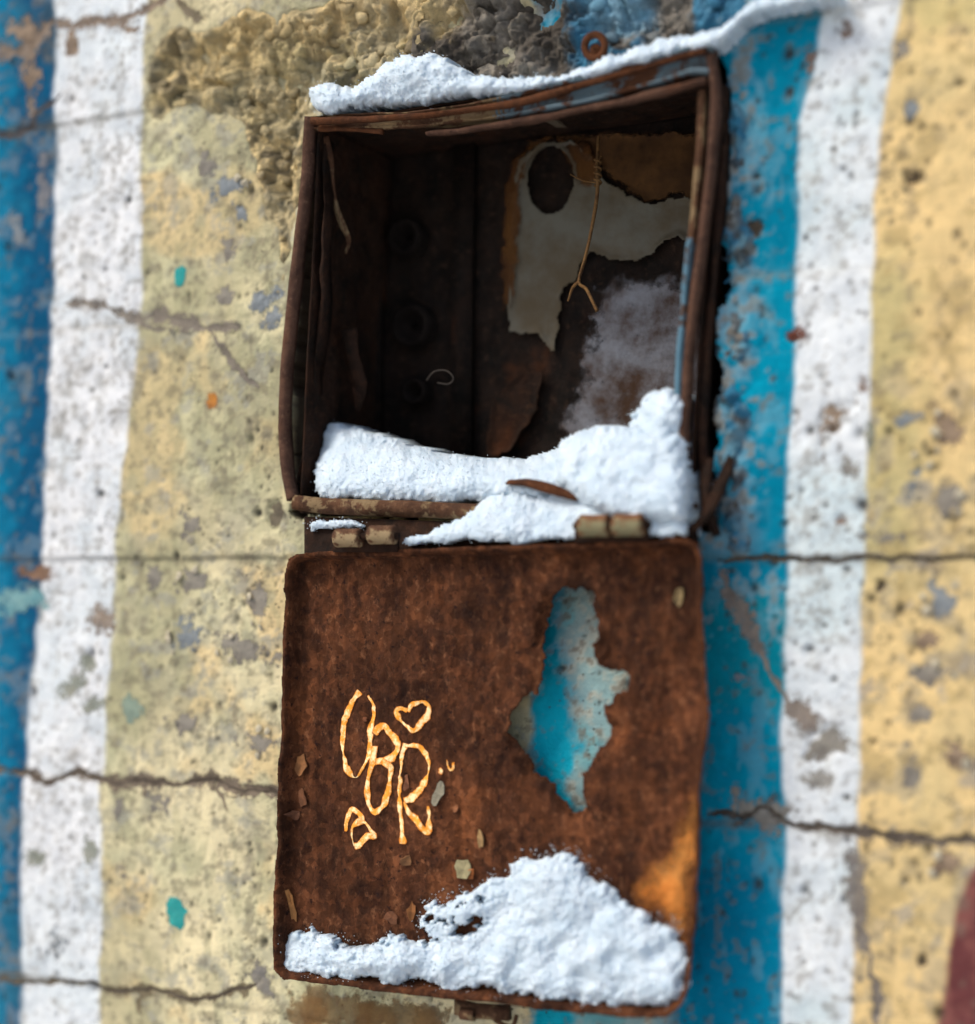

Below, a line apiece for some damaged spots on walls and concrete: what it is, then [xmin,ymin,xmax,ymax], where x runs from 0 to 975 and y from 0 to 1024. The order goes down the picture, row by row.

spalling [143,0,748,330]
spalling [722,193,764,299]
crack [65,295,259,388]
spalling [712,312,753,556]
crack [0,762,278,810]
crack [708,793,975,1024]
crack [0,975,258,1015]
rust [287,985,451,1024]